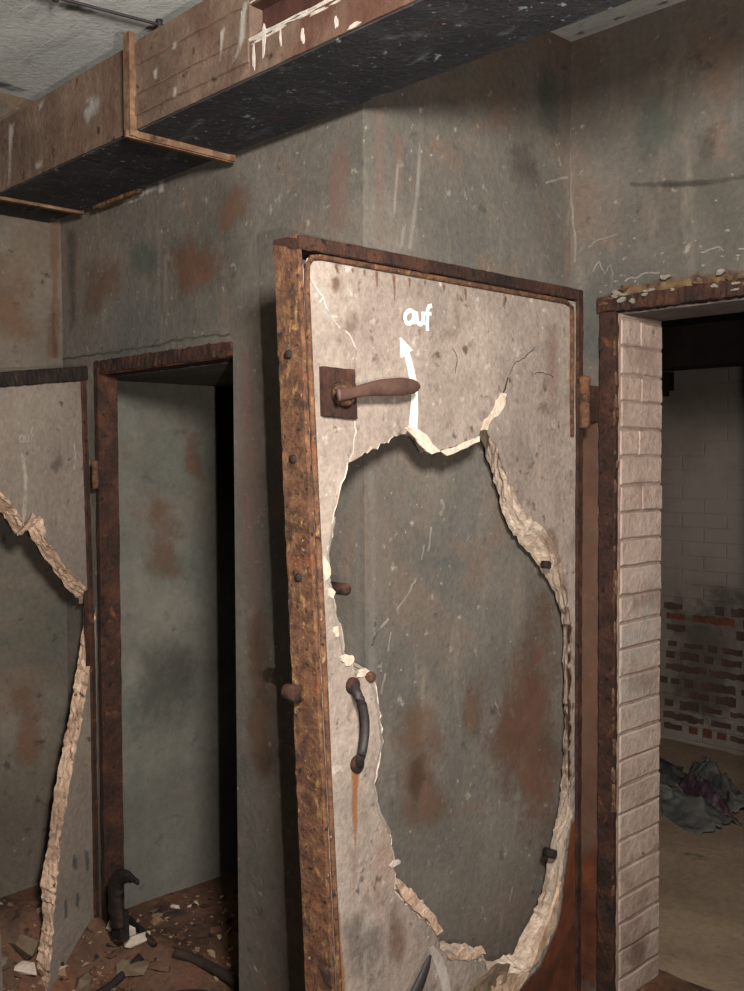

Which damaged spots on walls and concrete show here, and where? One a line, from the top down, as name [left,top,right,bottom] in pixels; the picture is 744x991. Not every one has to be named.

spalling [315,377,573,991]
rust [519,421,599,991]